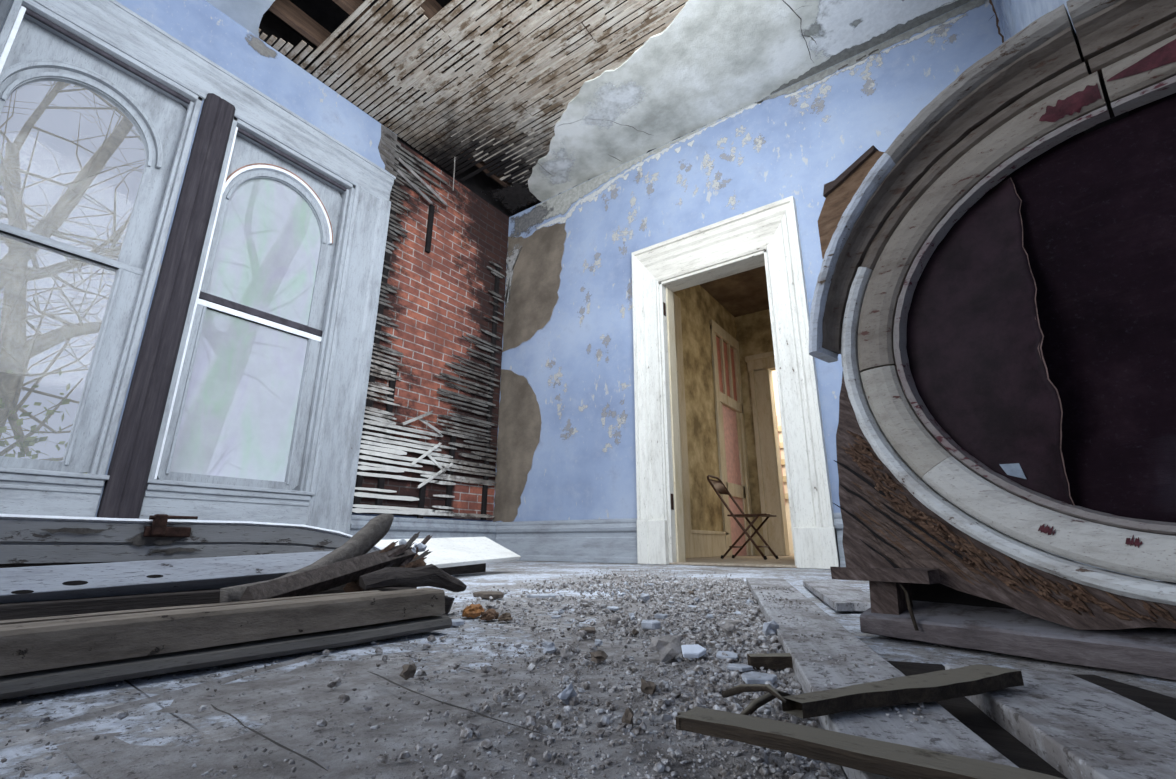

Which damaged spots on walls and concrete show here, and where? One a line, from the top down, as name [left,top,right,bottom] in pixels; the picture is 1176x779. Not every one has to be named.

flaking render [259,0,987,522]
crack [782,0,816,63]